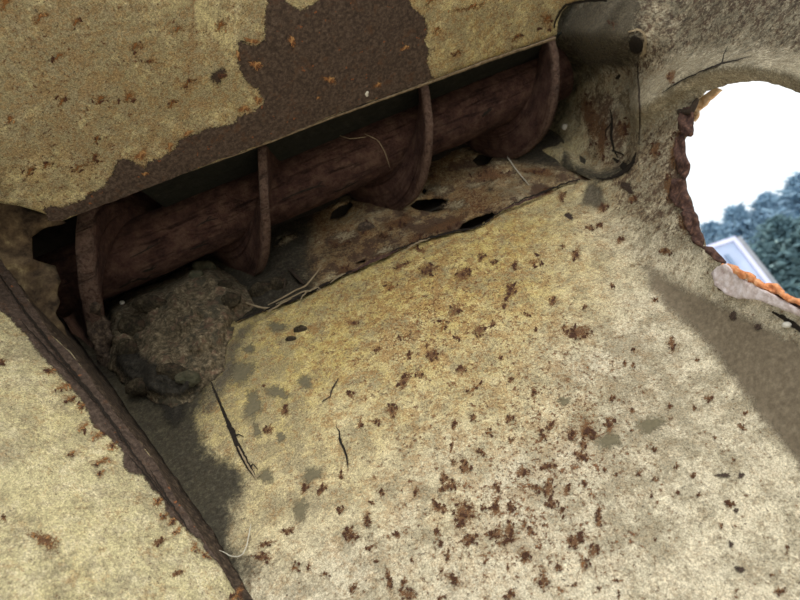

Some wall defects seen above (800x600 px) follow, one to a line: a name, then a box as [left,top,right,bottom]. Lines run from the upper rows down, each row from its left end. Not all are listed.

crack [662,46,751,93]
peeling [43,0,434,221]
rust [649,88,800,309]
peeling [711,264,800,317]
rust [559,322,598,340]
crack [211,382,260,478]
rust [566,415,616,463]
rust [431,418,548,565]
rust [514,462,588,519]
rust [342,488,420,600]
rust [433,525,461,589]
rust [564,529,602,572]